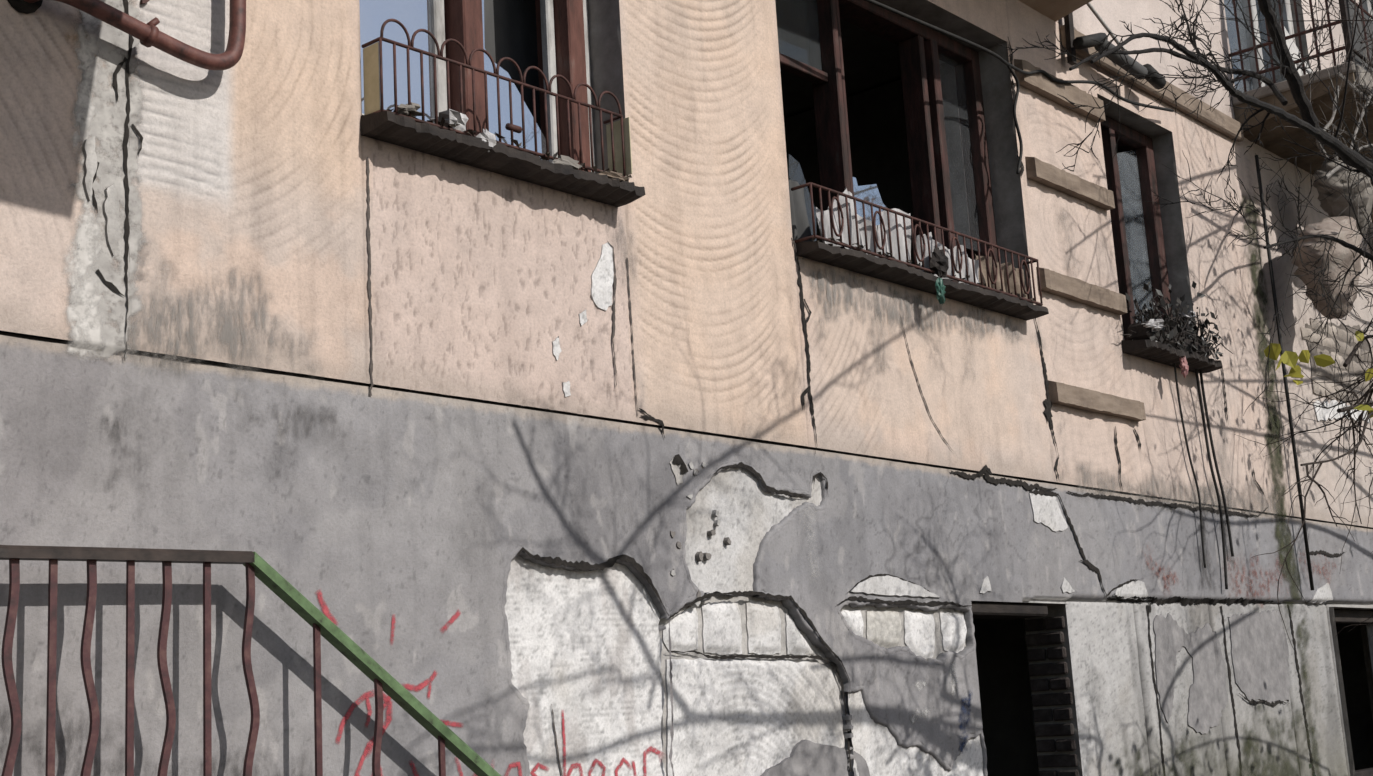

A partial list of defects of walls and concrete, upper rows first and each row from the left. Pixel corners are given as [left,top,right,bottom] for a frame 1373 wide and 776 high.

peeling [82,136,121,256]
crack [93,0,143,360]
peeling [552,336,562,361]
peeling [562,381,571,397]
peeling [578,241,617,397]
crack [792,236,817,454]
flaking render [501,454,992,776]
flaking render [1029,493,1068,532]
crack [899,313,1315,776]
crack [1310,549,1345,557]